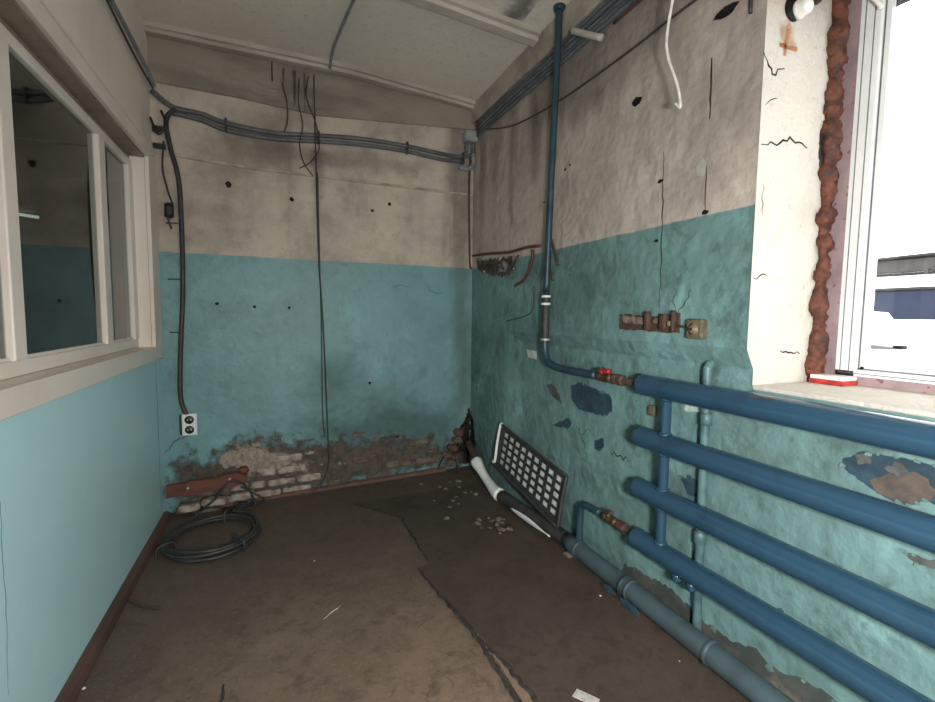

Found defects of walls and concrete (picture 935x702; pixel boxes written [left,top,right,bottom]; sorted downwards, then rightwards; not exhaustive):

peeling [552,418,571,430]
peeling [547,382,613,418]
spalling [166,408,476,513]
peeling [838,451,935,507]
spalling [620,563,837,702]